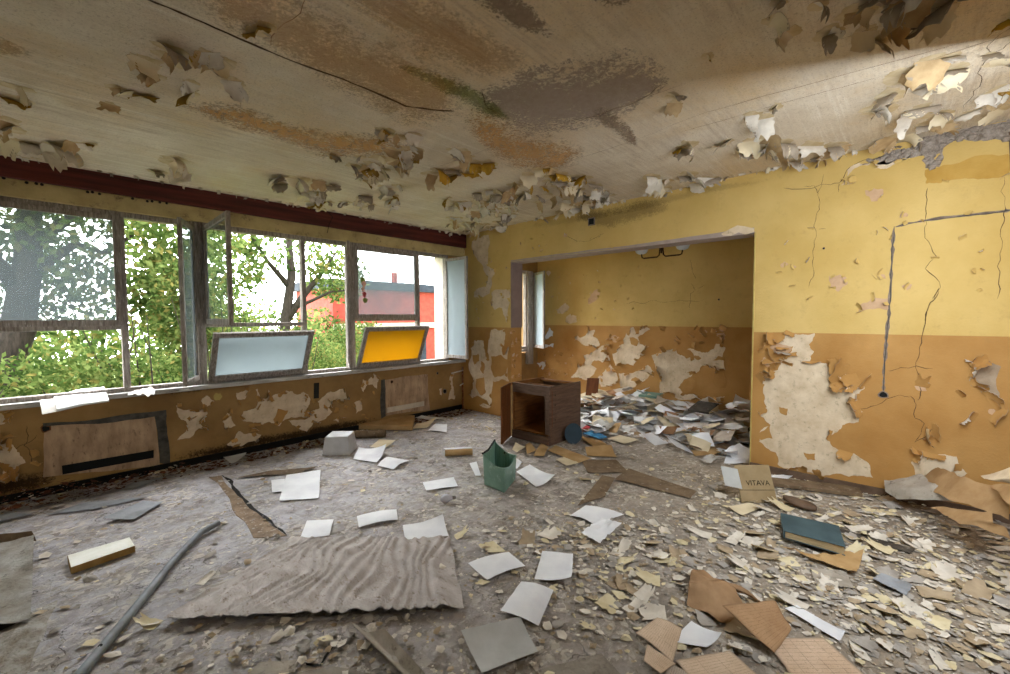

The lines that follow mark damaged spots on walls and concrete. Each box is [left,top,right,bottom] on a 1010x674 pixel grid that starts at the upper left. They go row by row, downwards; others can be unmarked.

leakage [475,0,551,38]
peeling [96,40,249,115]
leakage [480,48,667,145]
peeling [643,0,1010,198]
peeling [223,374,393,447]
peeling [216,127,626,408]
peeling [556,303,727,402]
peeling [755,330,873,480]
crack [786,160,864,284]
crack [863,191,941,441]
peeling [910,423,972,480]
peeling [955,355,1008,427]